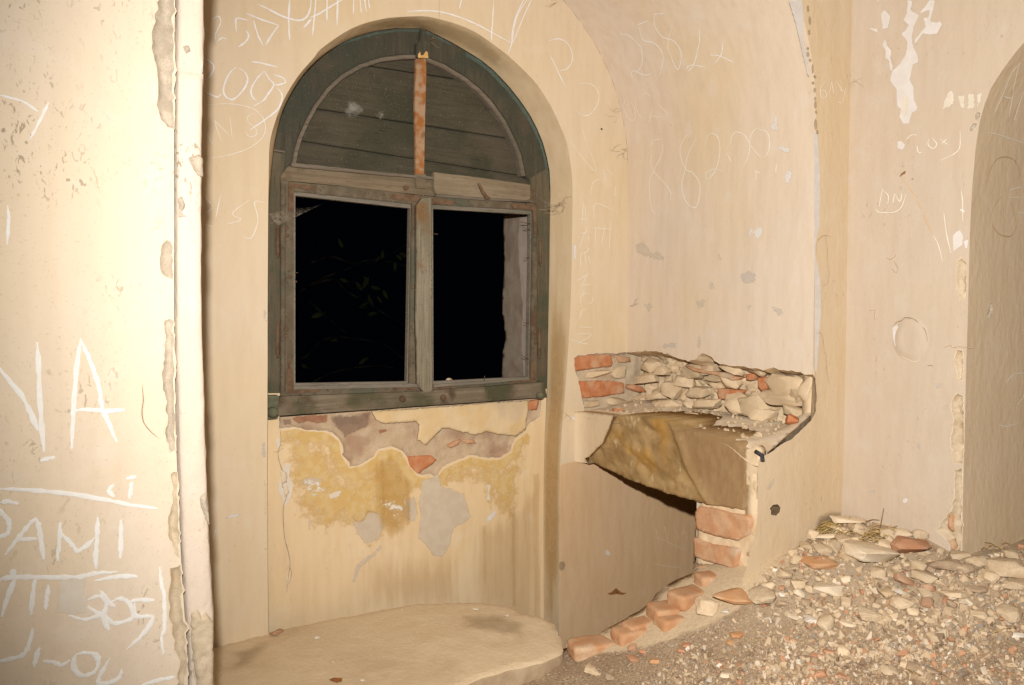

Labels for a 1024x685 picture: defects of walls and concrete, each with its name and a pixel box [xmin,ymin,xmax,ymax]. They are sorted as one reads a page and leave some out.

spalling [150,0,191,130]
peeling [870,0,942,124]
spalling [188,155,203,177]
spalling [159,240,174,280]
spalling [570,0,821,568]
spalling [160,319,177,453]
spalling [166,471,214,685]
spalling [200,492,217,535]
spalling [262,398,542,582]
spalling [935,349,964,551]